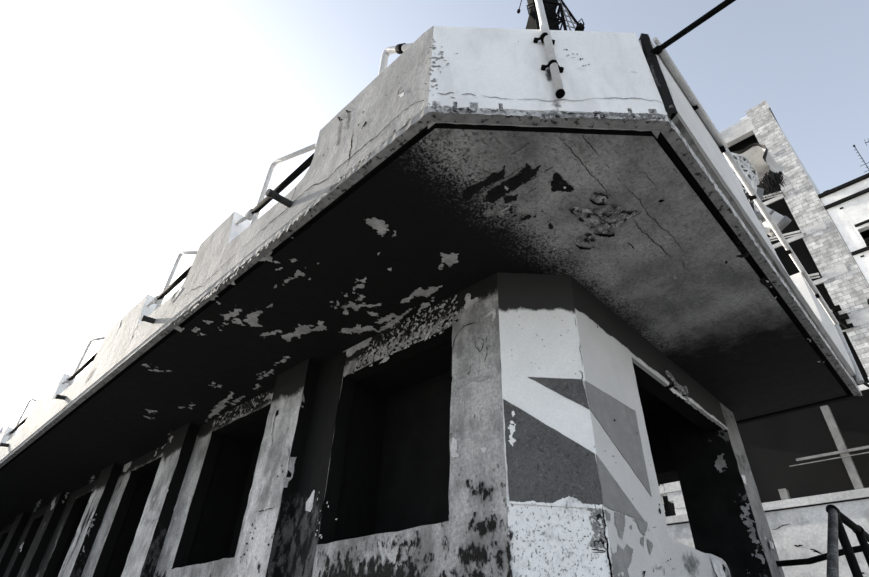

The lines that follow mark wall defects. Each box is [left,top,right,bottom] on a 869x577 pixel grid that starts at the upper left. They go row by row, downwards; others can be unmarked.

spalling [541,111,665,120]
crack [244,92,507,246]
spalling [462,163,543,221]
spalling [551,172,574,192]
crack [556,135,689,271]
peeling [330,277,478,377]
peeling [205,356,290,427]
leakage [281,351,434,577]
leakage [466,479,507,510]
peeling [508,411,516,446]
leakage [439,512,515,577]
peeling [508,496,656,577]